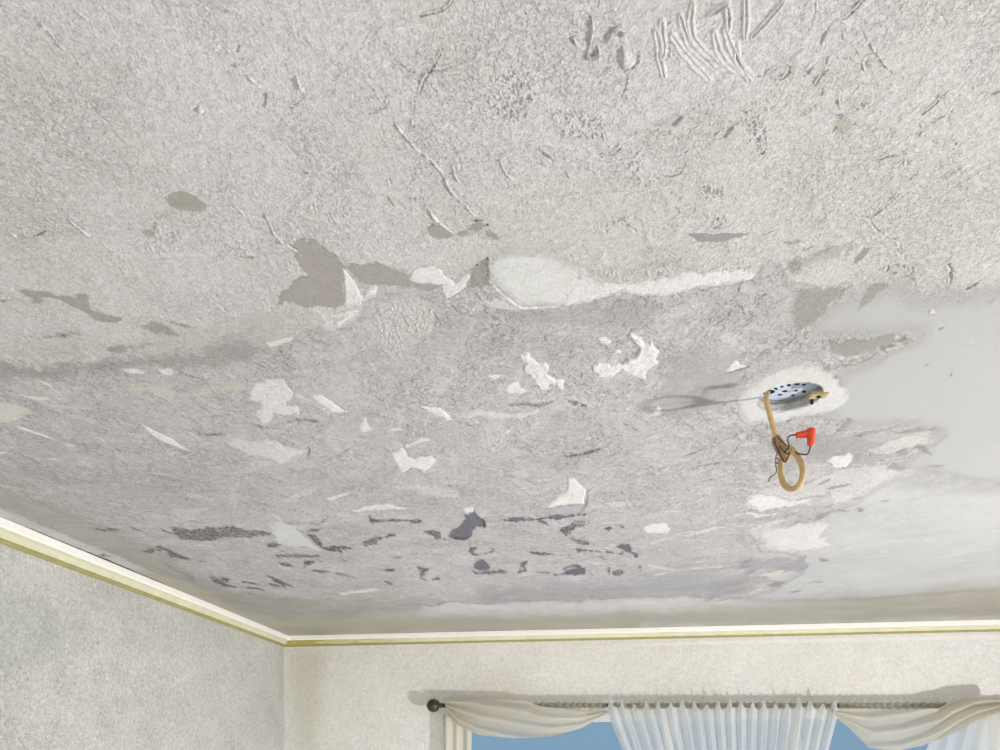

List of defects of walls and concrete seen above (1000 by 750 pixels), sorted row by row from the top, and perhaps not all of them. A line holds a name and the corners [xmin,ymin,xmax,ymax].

peeling [128,191,207,237]
peeling [0,237,935,614]